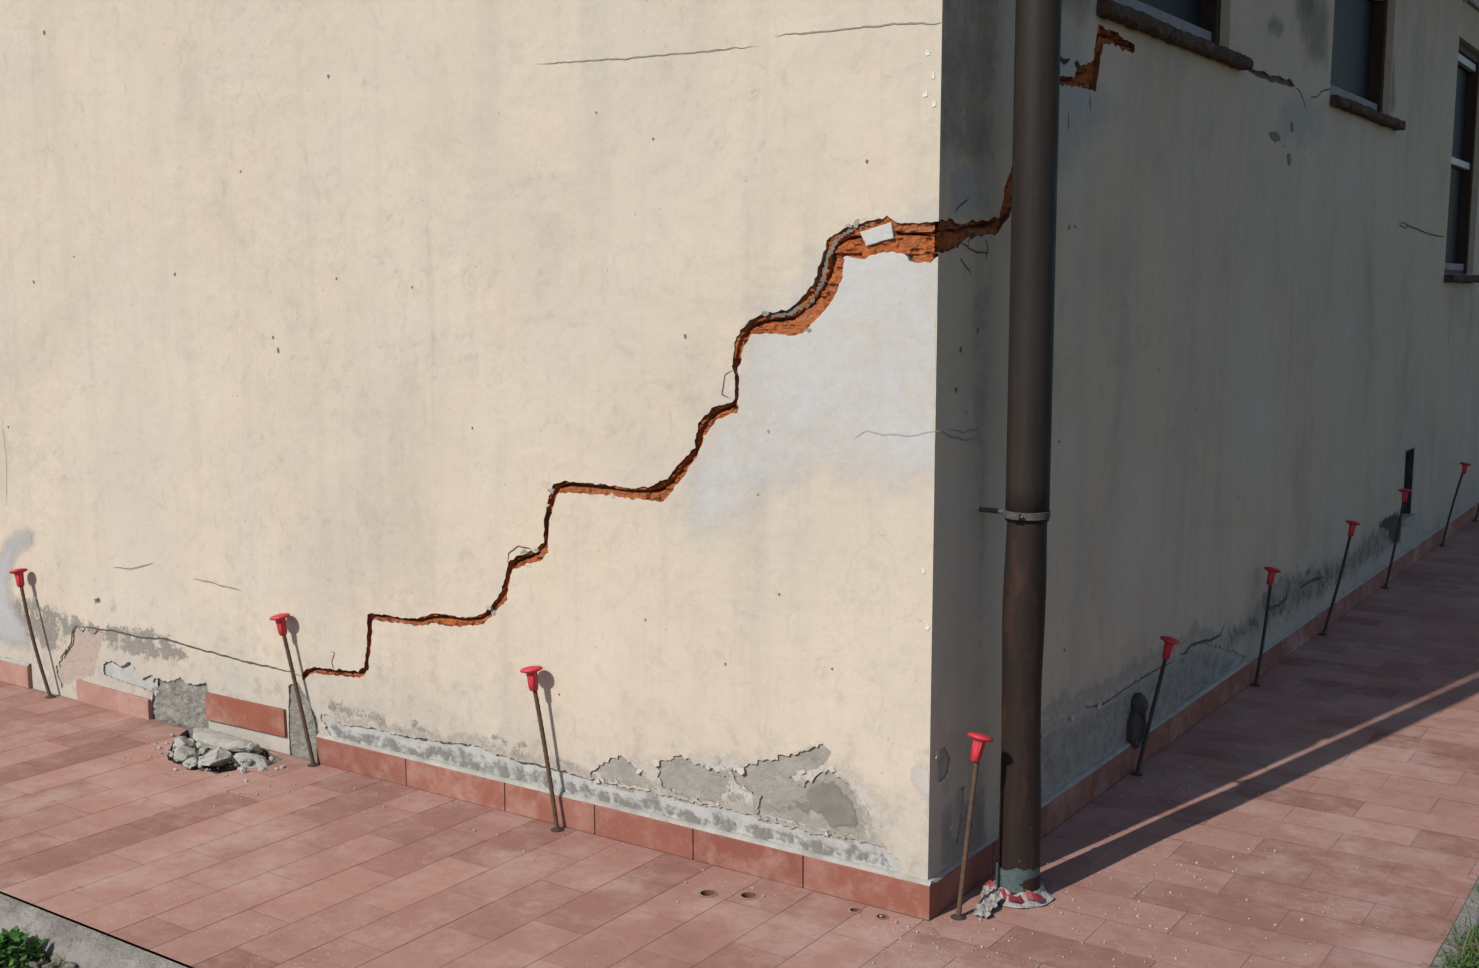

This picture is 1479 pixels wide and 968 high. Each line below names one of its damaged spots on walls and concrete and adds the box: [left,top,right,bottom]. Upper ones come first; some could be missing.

crack [545,22,942,64]
crack [1060,26,1130,129]
crack [60,168,1012,680]
flaking render [105,661,241,774]
flaking render [259,684,901,872]